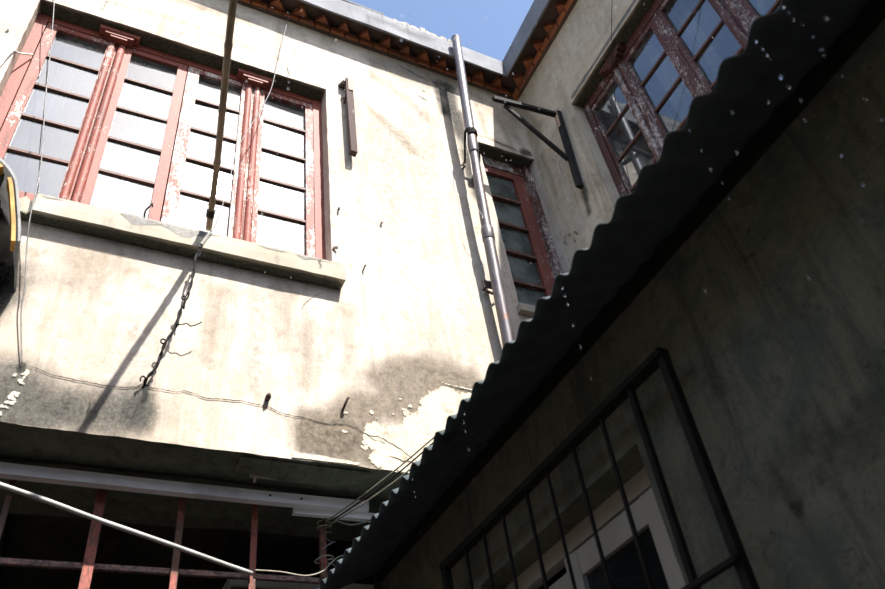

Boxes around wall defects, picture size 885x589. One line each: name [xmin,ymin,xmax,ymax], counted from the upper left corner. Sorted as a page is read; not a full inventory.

flaking render [0,362,30,416]
damp [0,363,152,434]
crack [4,365,413,463]
flaking render [235,386,471,486]
damp [296,358,475,463]